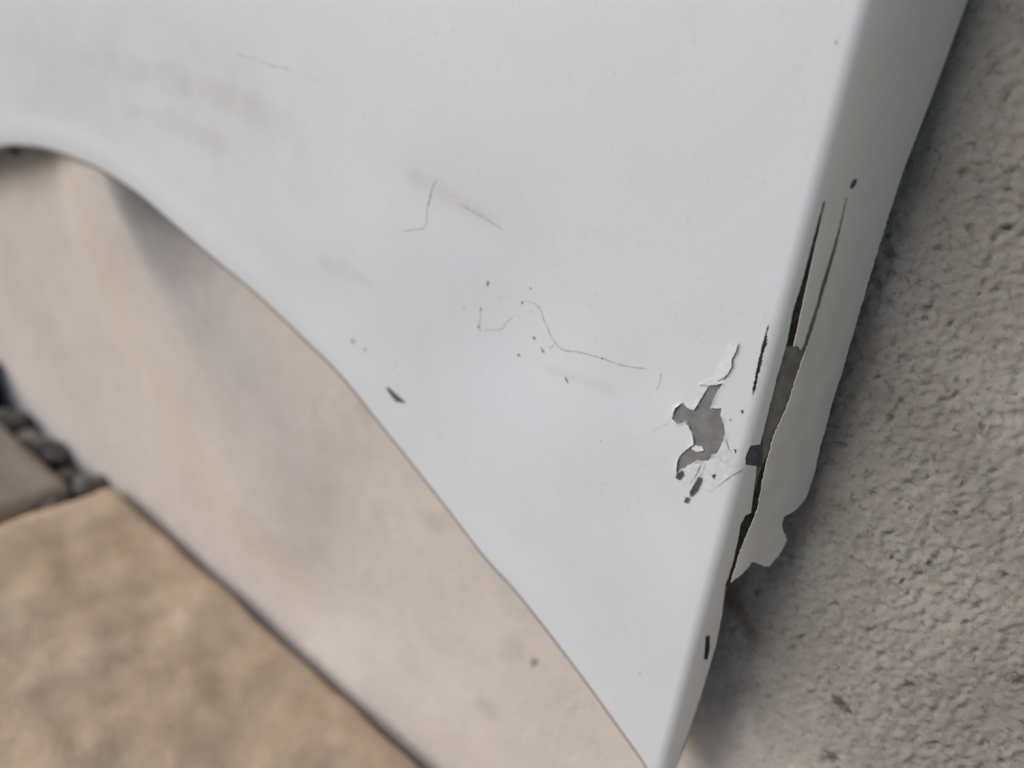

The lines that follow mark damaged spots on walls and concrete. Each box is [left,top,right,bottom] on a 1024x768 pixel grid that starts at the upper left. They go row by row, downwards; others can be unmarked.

peeling [672,179,892,590]